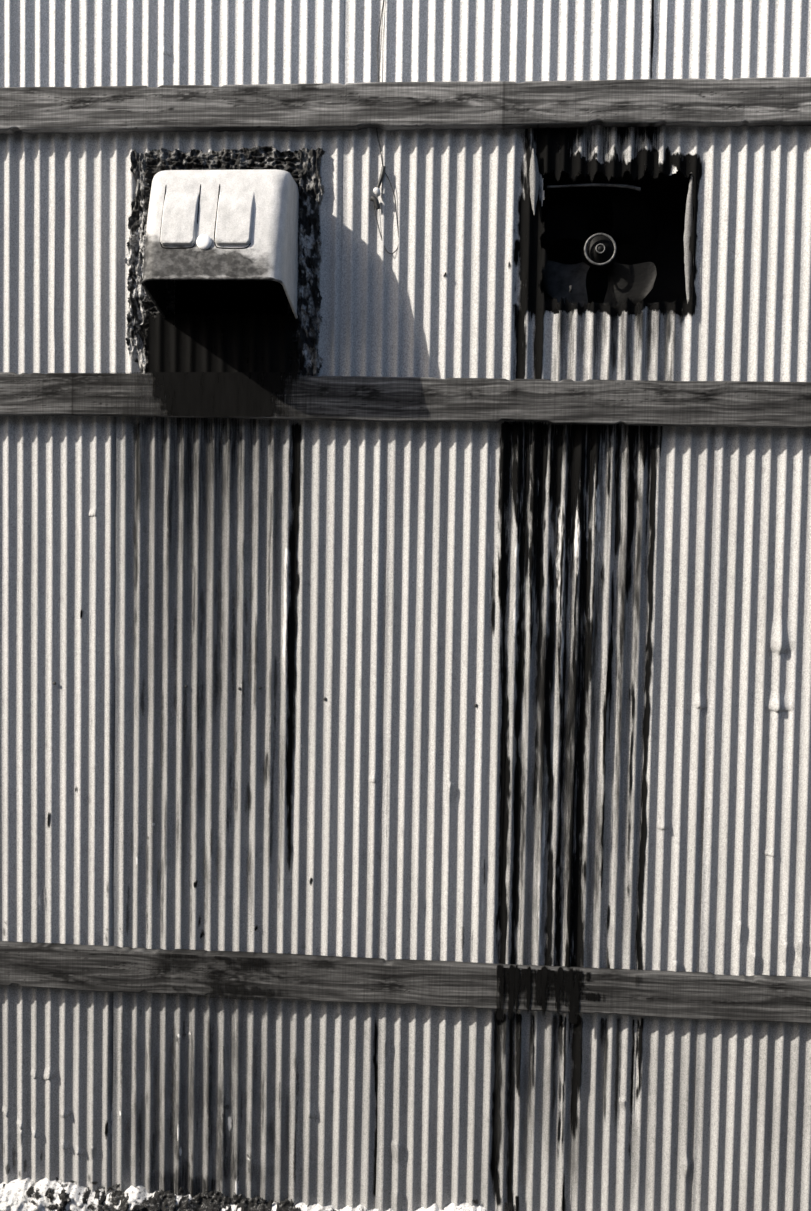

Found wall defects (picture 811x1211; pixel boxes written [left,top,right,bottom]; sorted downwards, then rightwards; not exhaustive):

water stain [514,309,544,379]
water stain [636,310,651,364]
water stain [667,289,694,339]
water stain [134,417,301,932]
water stain [484,422,663,1211]
water stain [191,956,281,1001]